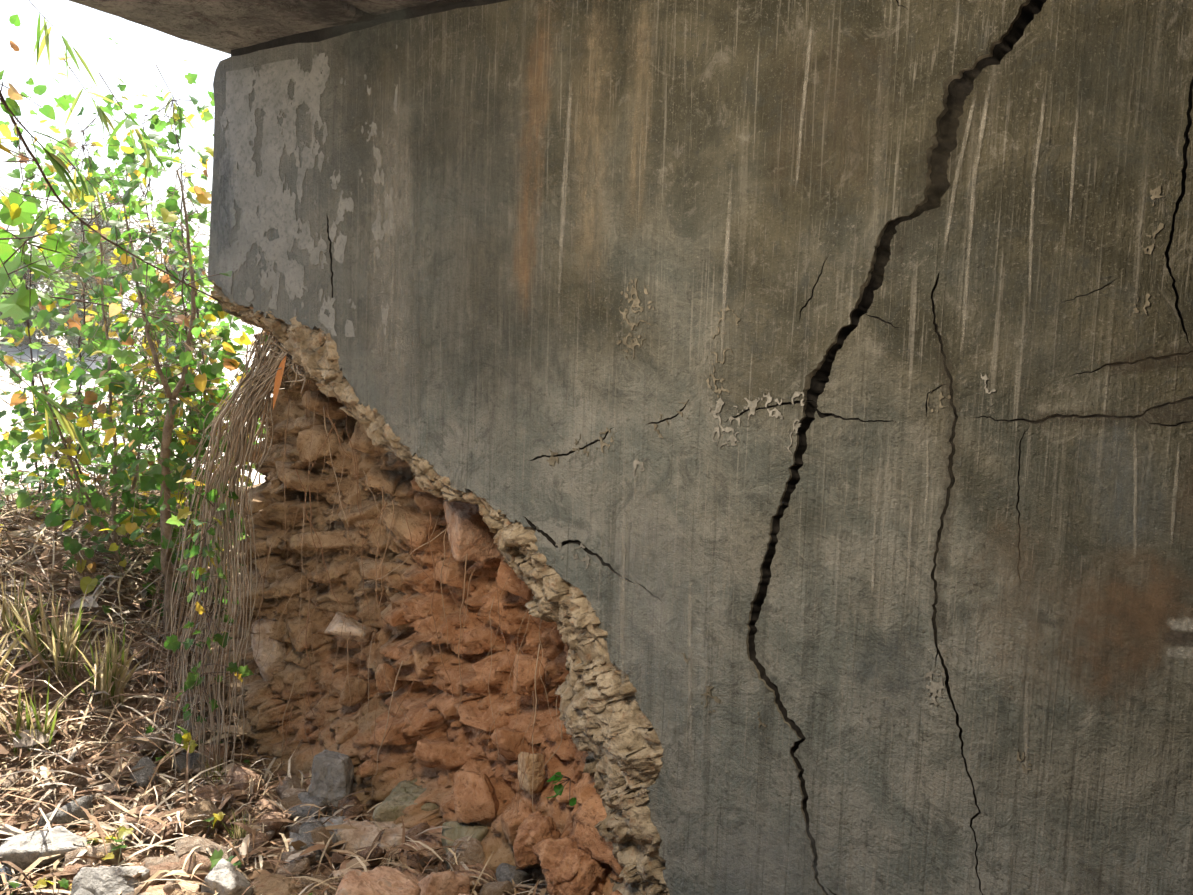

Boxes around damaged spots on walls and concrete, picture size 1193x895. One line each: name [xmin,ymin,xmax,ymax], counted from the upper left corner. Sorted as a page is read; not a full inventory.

crack [1070,78,1193,376]
spalling [211,53,670,895]
crack [528,427,614,461]
crack [523,516,664,604]
crack [646,404,686,425]
crack [725,0,1047,895]
crack [925,268,1193,895]